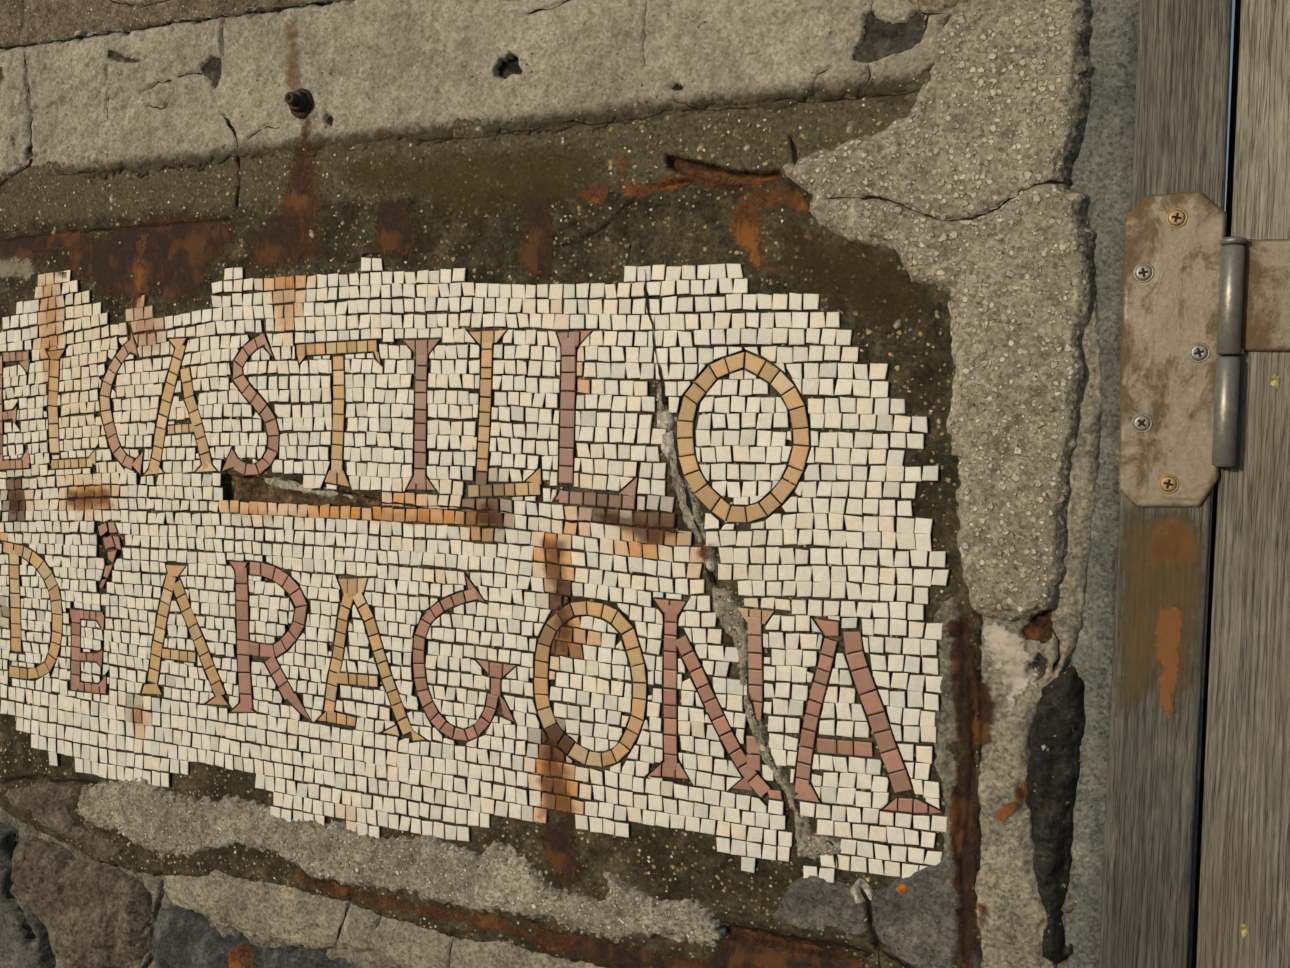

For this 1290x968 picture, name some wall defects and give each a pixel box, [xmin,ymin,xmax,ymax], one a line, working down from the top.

corrosion [287,25,297,91]
spalling [853,0,969,63]
corrosion [0,211,234,302]
corrosion [250,115,322,270]
corrosion [579,154,808,268]
crack [826,180,1071,222]
crack [381,198,912,968]
spalling [1022,609,1053,680]
corrosion [946,613,995,968]
corrosion [996,782,1028,822]
corrosion [540,817,579,885]
corrosion [296,872,866,968]